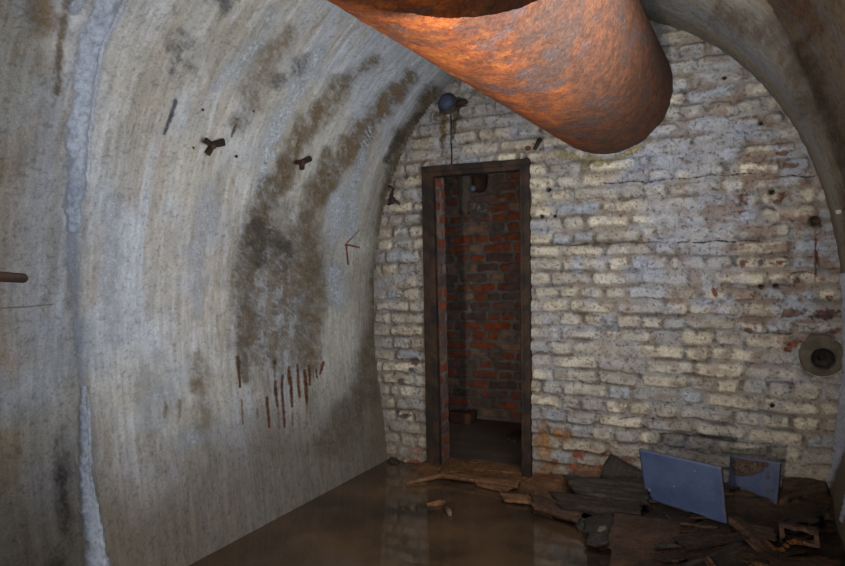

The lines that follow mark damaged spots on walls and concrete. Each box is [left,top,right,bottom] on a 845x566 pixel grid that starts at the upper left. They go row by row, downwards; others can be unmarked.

damp [32,0,127,319]
damp [217,10,414,383]
damp [376,86,441,234]
corrosion [433,107,458,148]
damp [79,363,109,566]
corrosion [257,361,325,428]
damp [319,259,378,452]
damp [828,273,845,487]